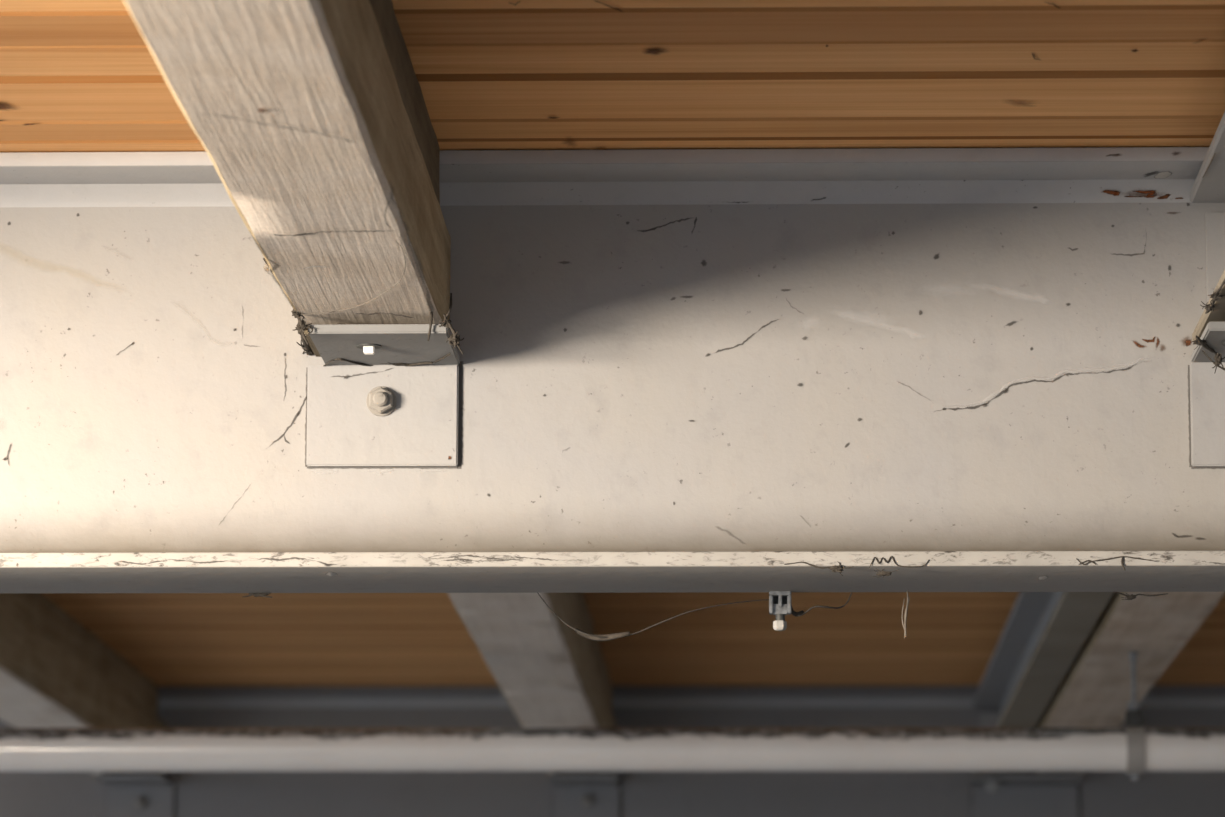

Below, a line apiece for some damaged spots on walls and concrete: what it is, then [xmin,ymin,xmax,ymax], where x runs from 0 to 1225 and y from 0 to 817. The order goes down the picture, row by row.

crack [706,320,776,356]
crack [942,367,1131,410]